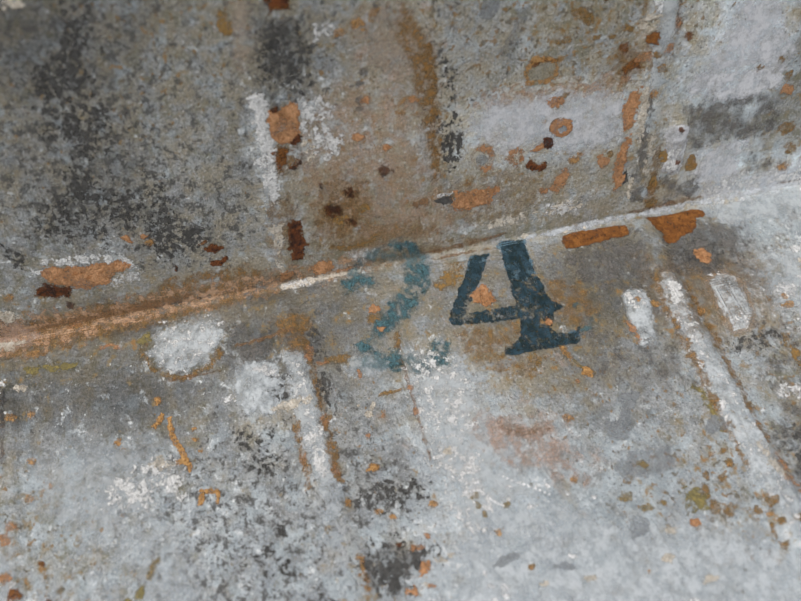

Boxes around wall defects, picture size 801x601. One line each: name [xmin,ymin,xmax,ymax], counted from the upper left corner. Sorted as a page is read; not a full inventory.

rust [264,0,291,15]
rust [513,24,674,108]
rust [266,101,302,175]
rust [472,118,573,173]
rust [597,86,659,192]
rust [685,154,697,171]
rust [0,203,380,375]
rust [421,232,504,291]
rust [561,225,648,290]
rust [629,175,744,276]
leakage [140,310,244,381]
leakage [315,370,332,407]